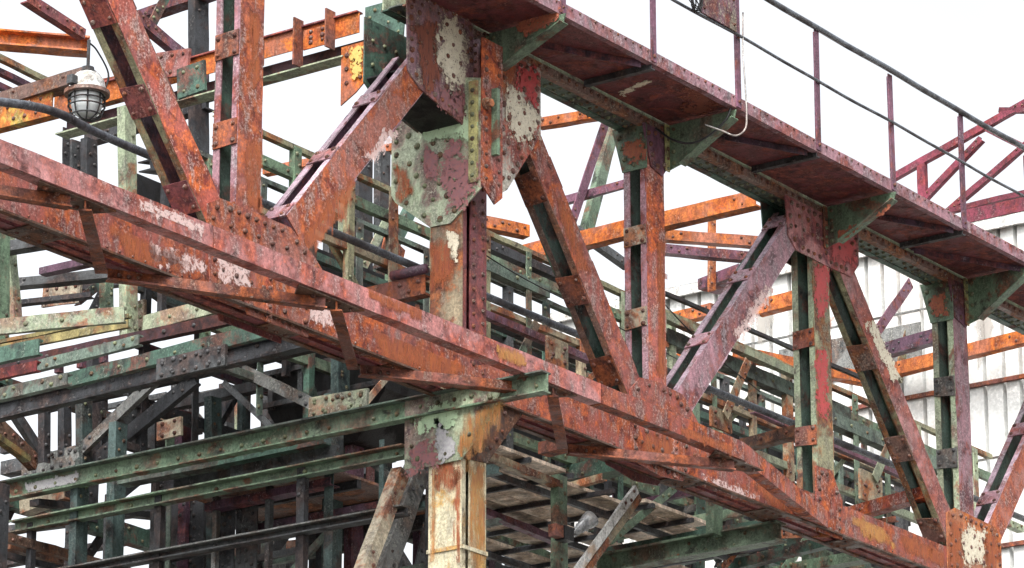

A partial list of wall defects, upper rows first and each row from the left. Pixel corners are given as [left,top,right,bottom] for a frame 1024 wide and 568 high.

peeling [421,10,484,215]
peeling [504,63,542,153]
corrosion [369,289,422,321]
corrosion [656,242,669,381]
corrosion [373,330,467,374]
peeling [863,320,902,383]
peeling [405,400,458,478]
corrosion [430,397,500,565]
corrosion [638,428,731,469]